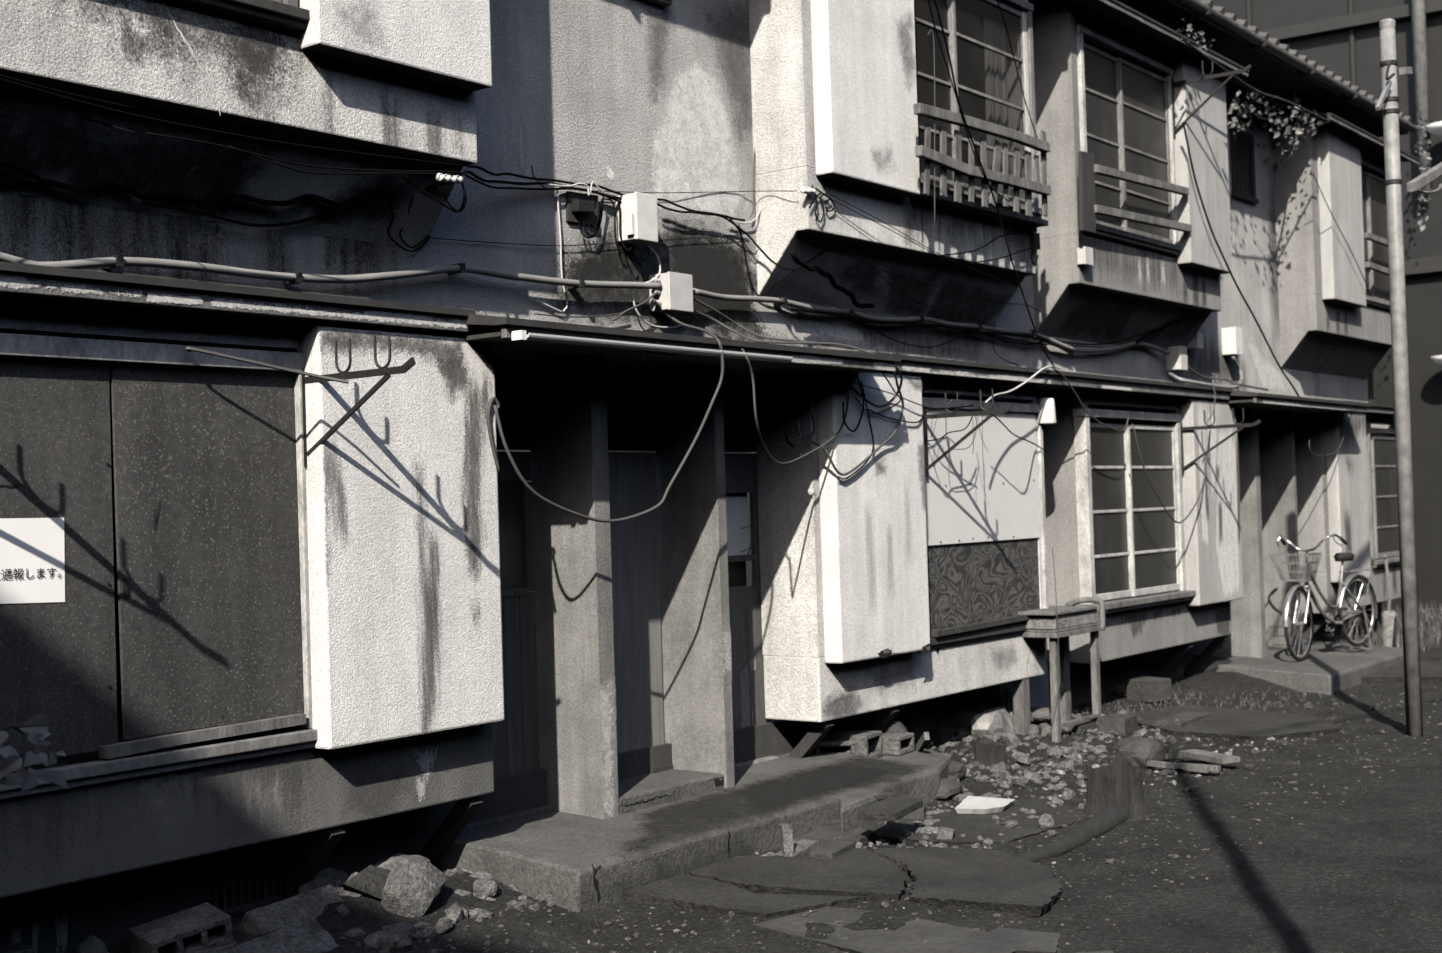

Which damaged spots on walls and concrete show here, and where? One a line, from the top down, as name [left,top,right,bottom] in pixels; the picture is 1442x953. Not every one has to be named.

water stain [62,0,303,118]
water stain [382,93,399,146]
water stain [426,112,462,154]
water stain [552,5,1009,362]
water stain [919,446,927,509]
water stain [351,466,439,817]